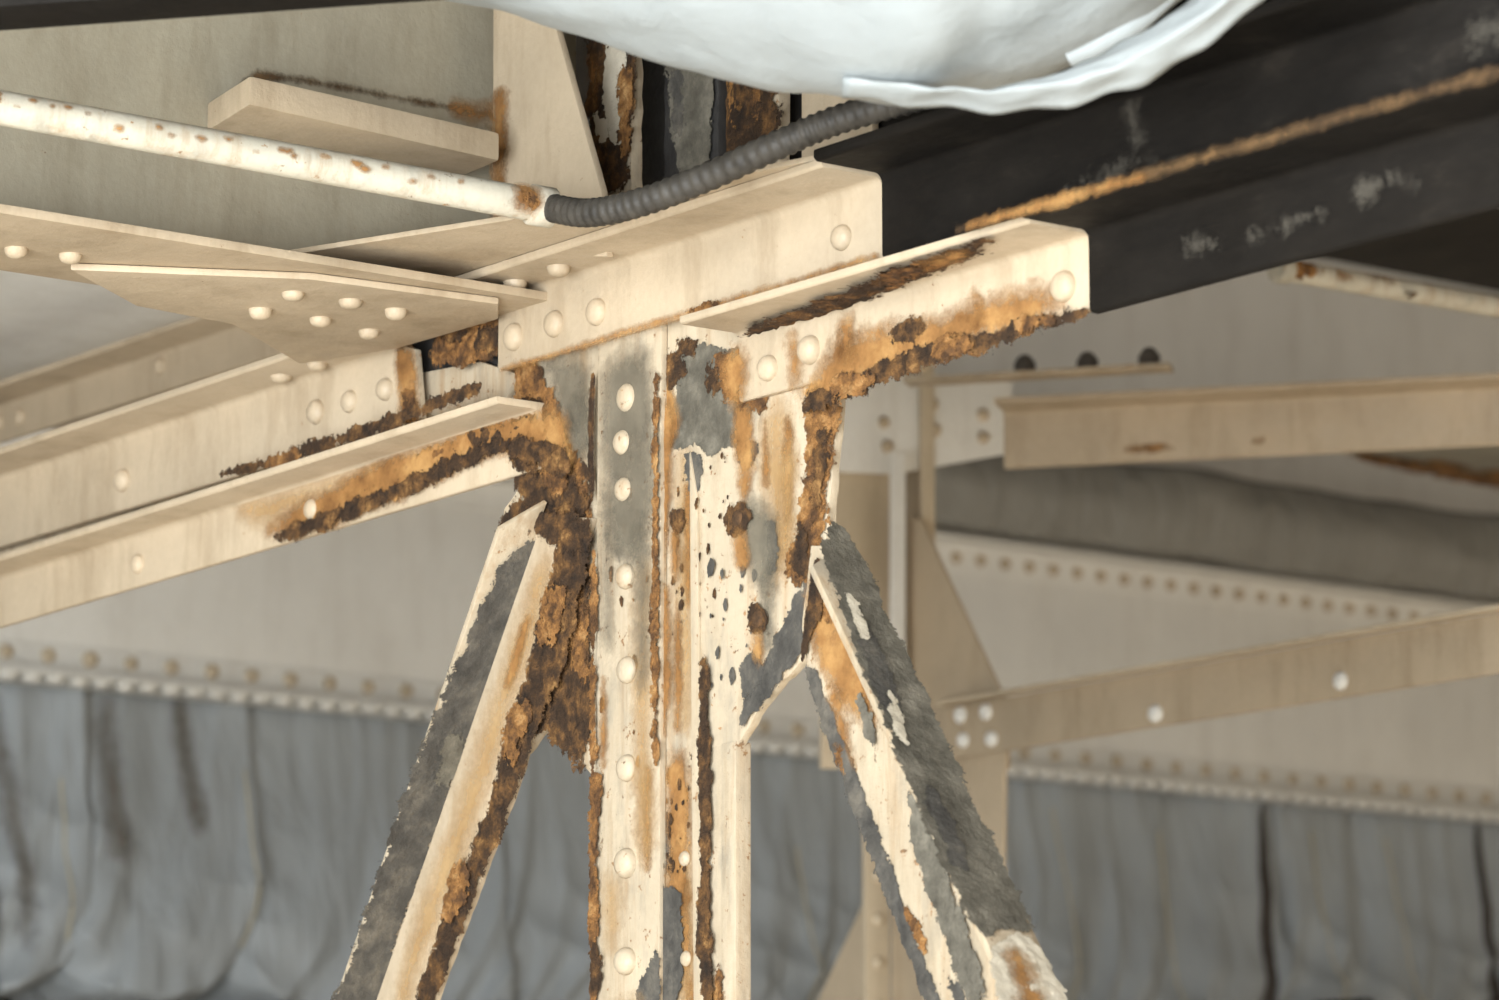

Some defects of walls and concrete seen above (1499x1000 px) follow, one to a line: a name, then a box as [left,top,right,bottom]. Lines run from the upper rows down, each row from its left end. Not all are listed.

corrosion [583,38,637,193]
peeling [667,342,808,728]
corrosion [219,67,1499,1000]
peeling [330,537,536,1000]
peeling [635,754,692,1000]
peeling [819,521,1068,1000]
damp [1259,804,1279,1000]
damp [1474,824,1499,1000]